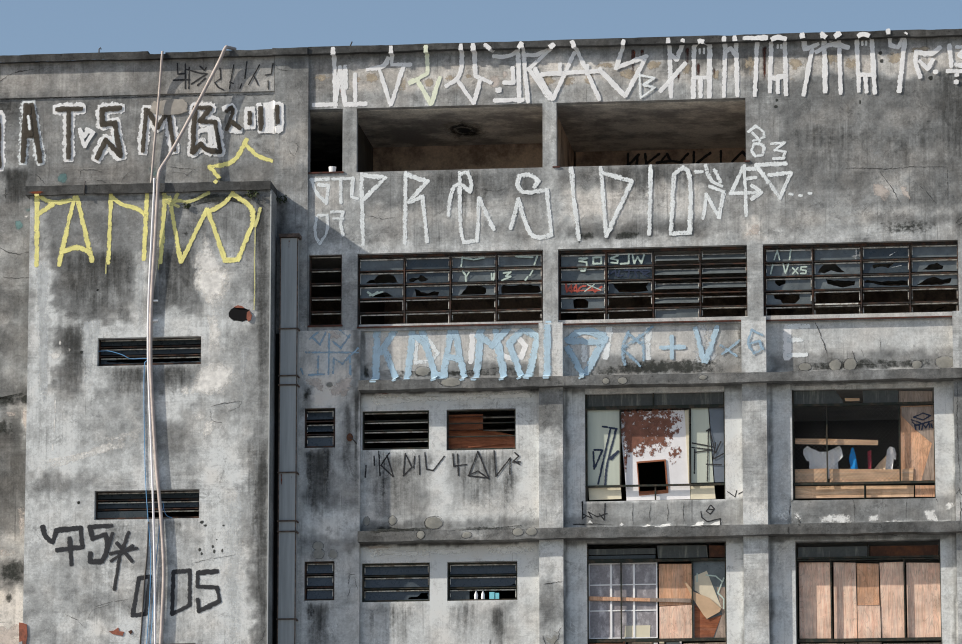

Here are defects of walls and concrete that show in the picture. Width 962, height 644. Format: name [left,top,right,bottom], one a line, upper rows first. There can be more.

leakage [446,122,484,139]
spalling [229,305,252,322]
crack [798,323,858,371]
leakage [0,394,27,404]
leakage [3,563,20,580]